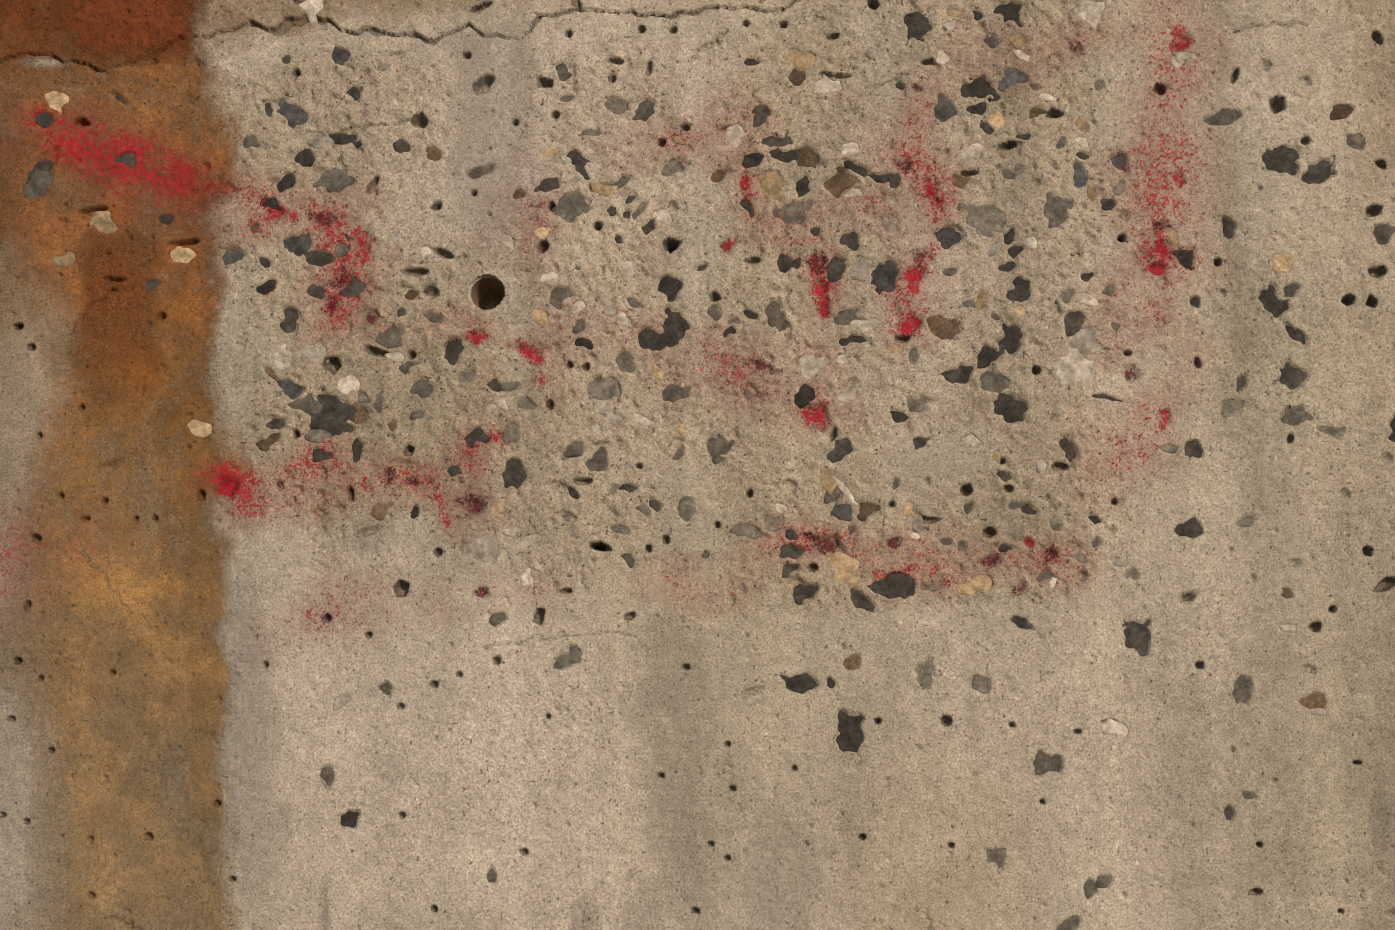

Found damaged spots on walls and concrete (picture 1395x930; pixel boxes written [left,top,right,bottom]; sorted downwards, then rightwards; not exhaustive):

corrosion [0,0,243,930]
crack [192,0,801,64]